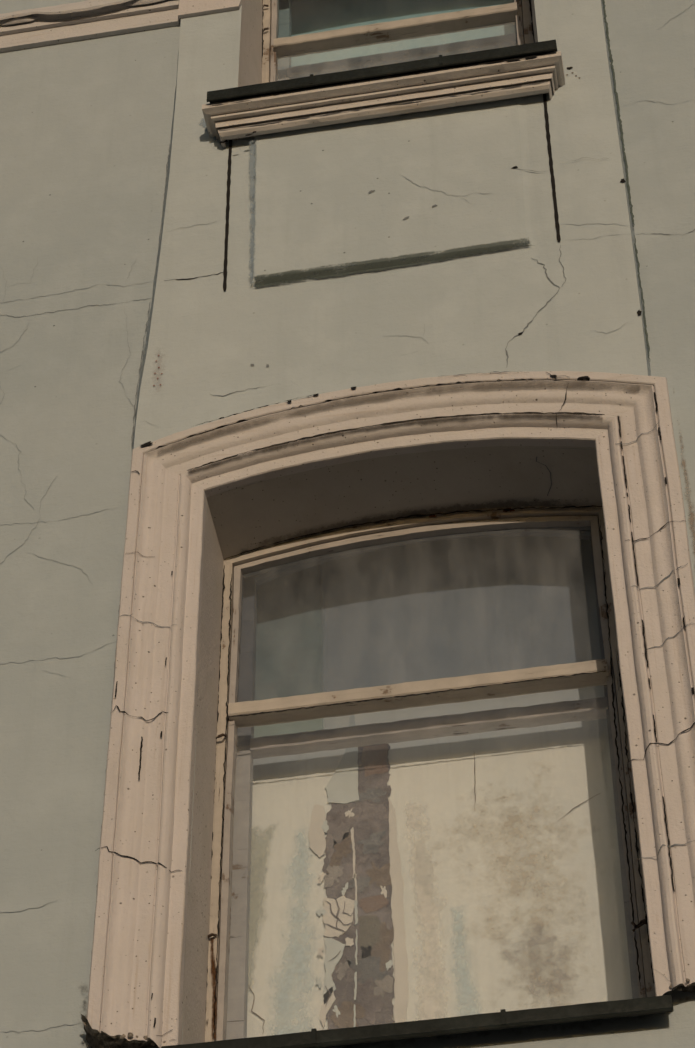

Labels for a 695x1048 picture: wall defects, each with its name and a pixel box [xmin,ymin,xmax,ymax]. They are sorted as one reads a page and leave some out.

crack [0,223,695,590]
crack [2,614,175,678]
crack [641,617,695,689]
crack [112,681,168,780]
crack [629,715,695,762]
crack [97,846,182,872]
crack [642,796,695,892]
spalling [669,978,695,993]
spalling [81,1014,158,1048]